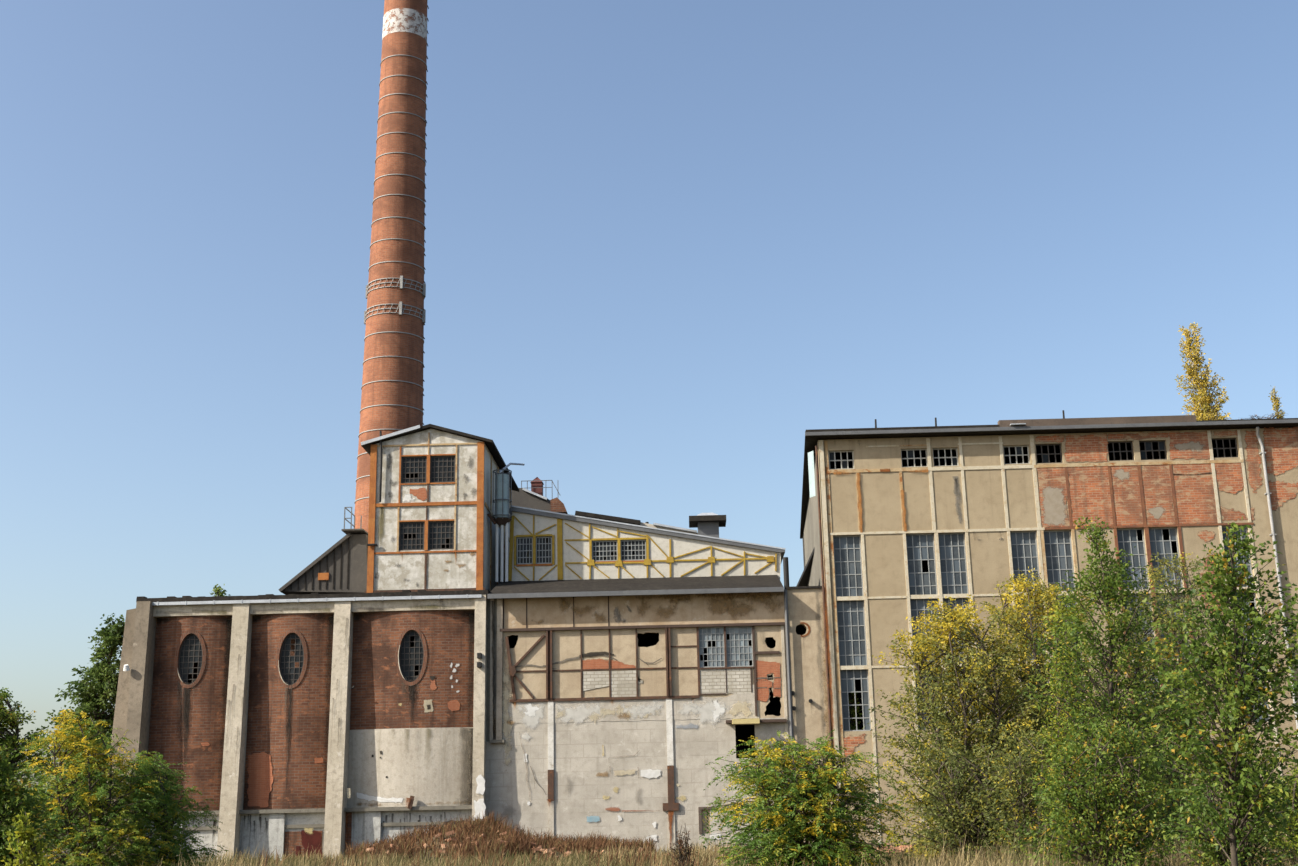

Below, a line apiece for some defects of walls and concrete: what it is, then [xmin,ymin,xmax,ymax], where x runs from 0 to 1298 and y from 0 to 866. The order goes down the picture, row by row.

peeling [1035,426,1298,614]
peeling [493,649,662,765]
peeling [680,660,781,723]